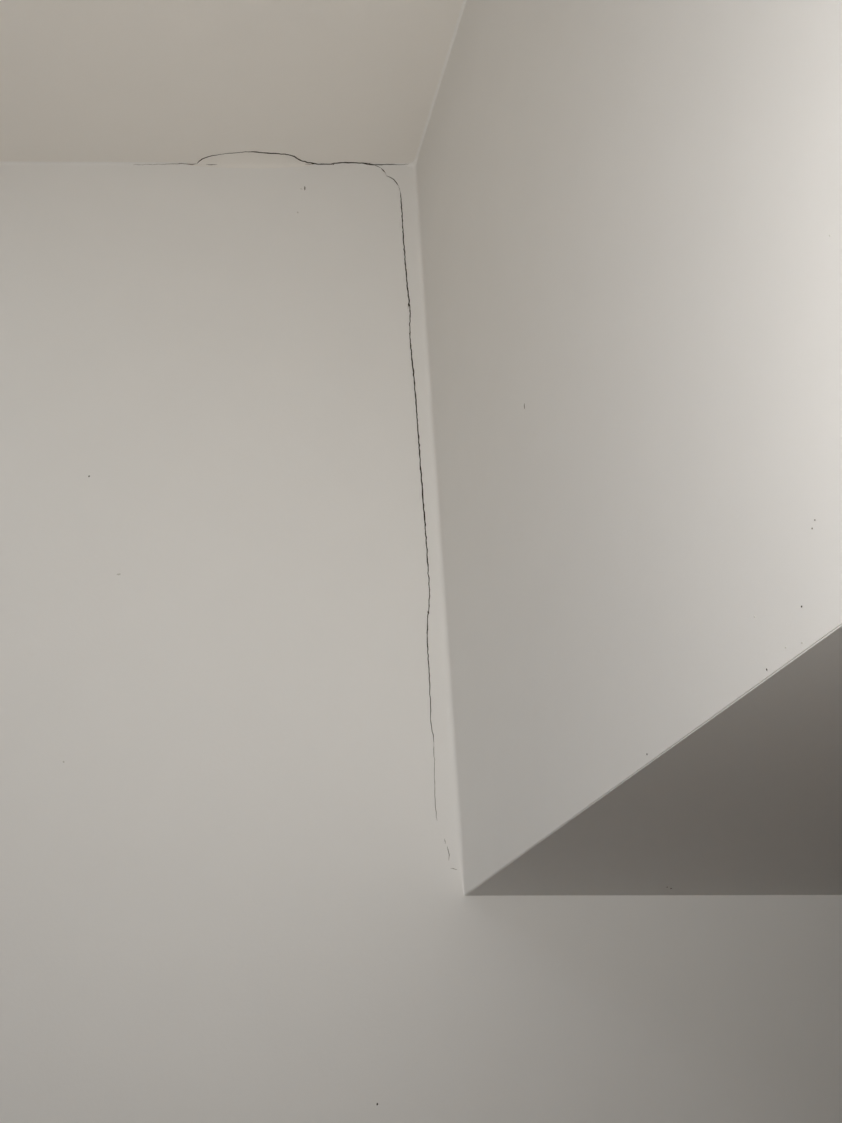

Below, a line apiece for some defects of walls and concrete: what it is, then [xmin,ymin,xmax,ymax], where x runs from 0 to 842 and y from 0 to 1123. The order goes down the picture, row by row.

crack [135,151,437,818]